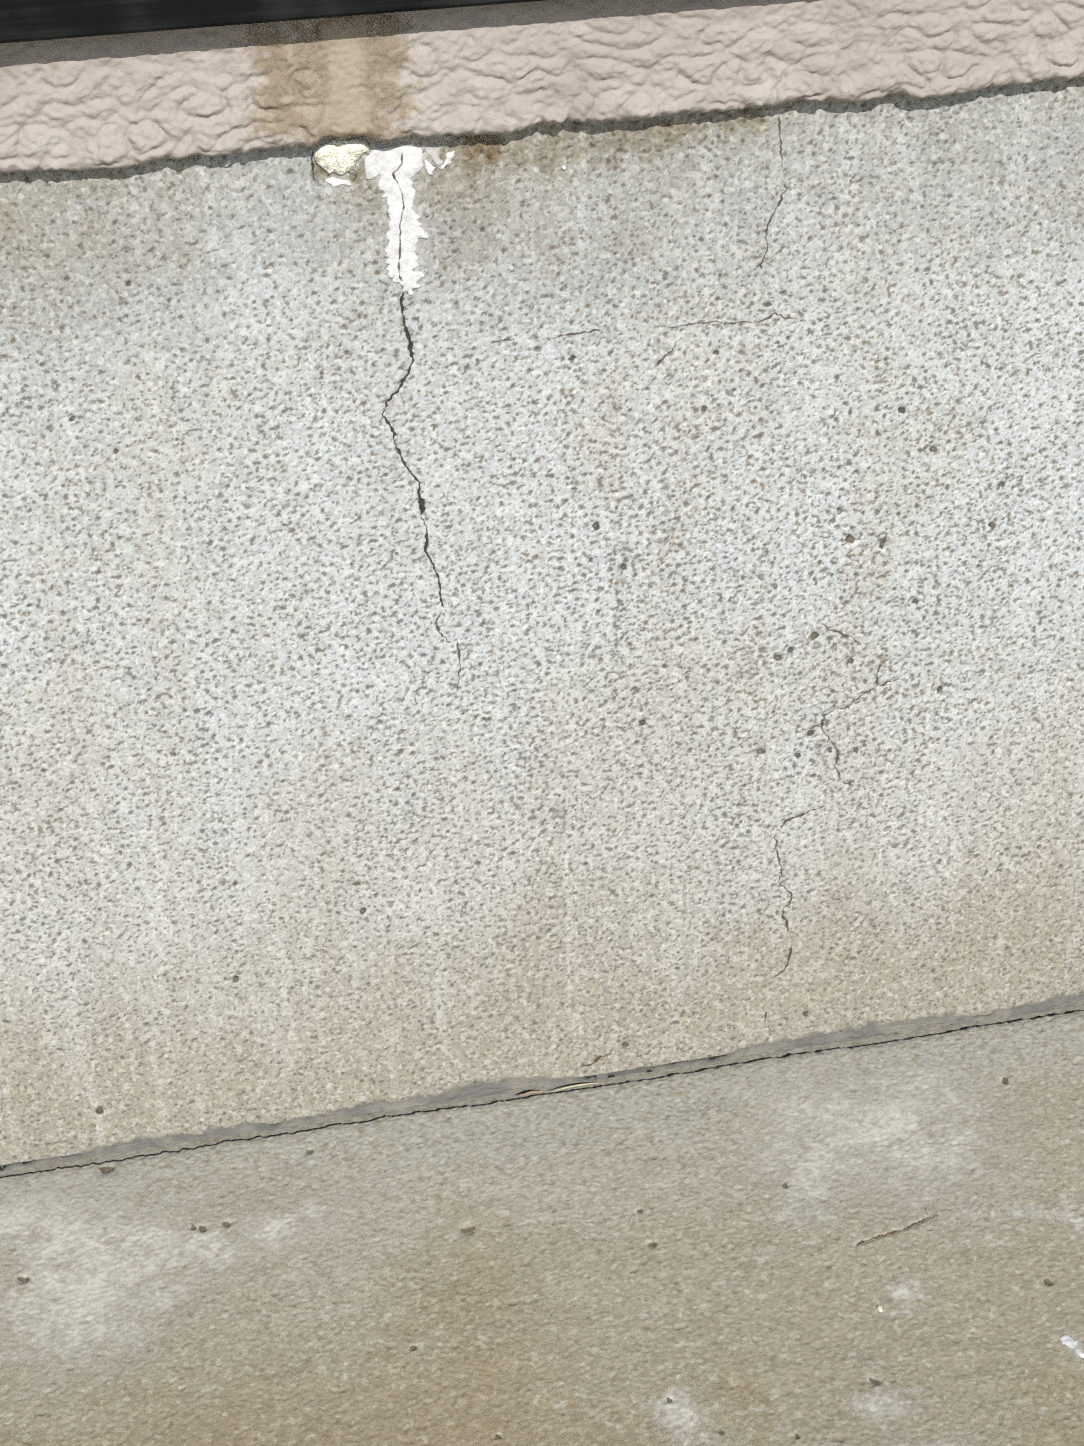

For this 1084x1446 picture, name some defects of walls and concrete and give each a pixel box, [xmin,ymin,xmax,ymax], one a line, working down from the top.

water stain [314,14,456,296]
crack [382,292,461,682]
crack [774,624,896,977]